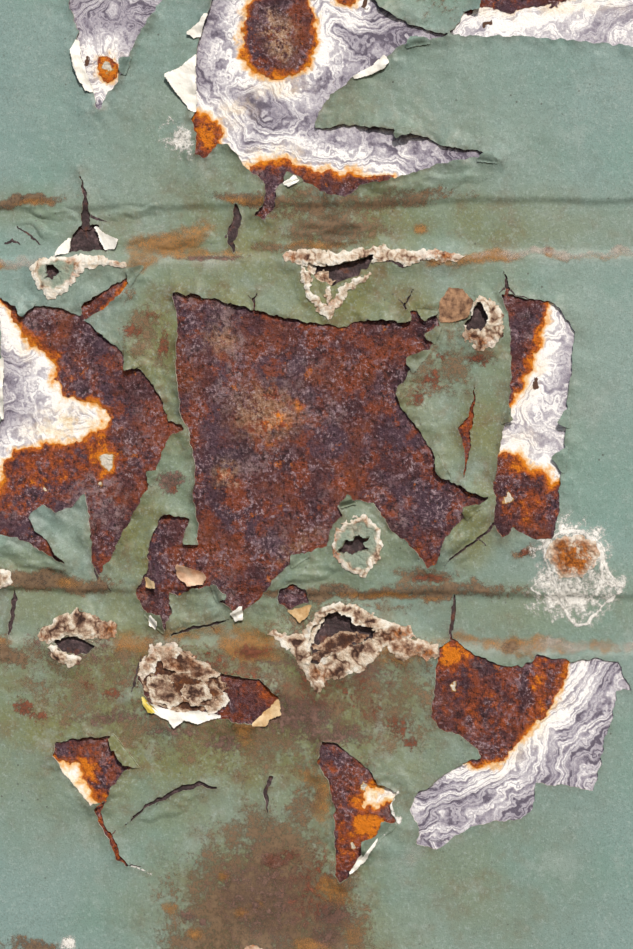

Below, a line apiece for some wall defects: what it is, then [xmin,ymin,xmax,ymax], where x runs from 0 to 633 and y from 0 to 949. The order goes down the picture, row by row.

peeling [69,0,162,109]
peeling [164,0,633,220]
peeling [0,265,575,728]
corrosion [512,546,537,559]
damp [529,514,626,627]
peeling [53,734,139,806]
crack [94,781,217,867]
corrosion [0,566,530,949]
crack [263,776,273,813]
peeling [317,741,396,883]
peeling [410,633,631,849]